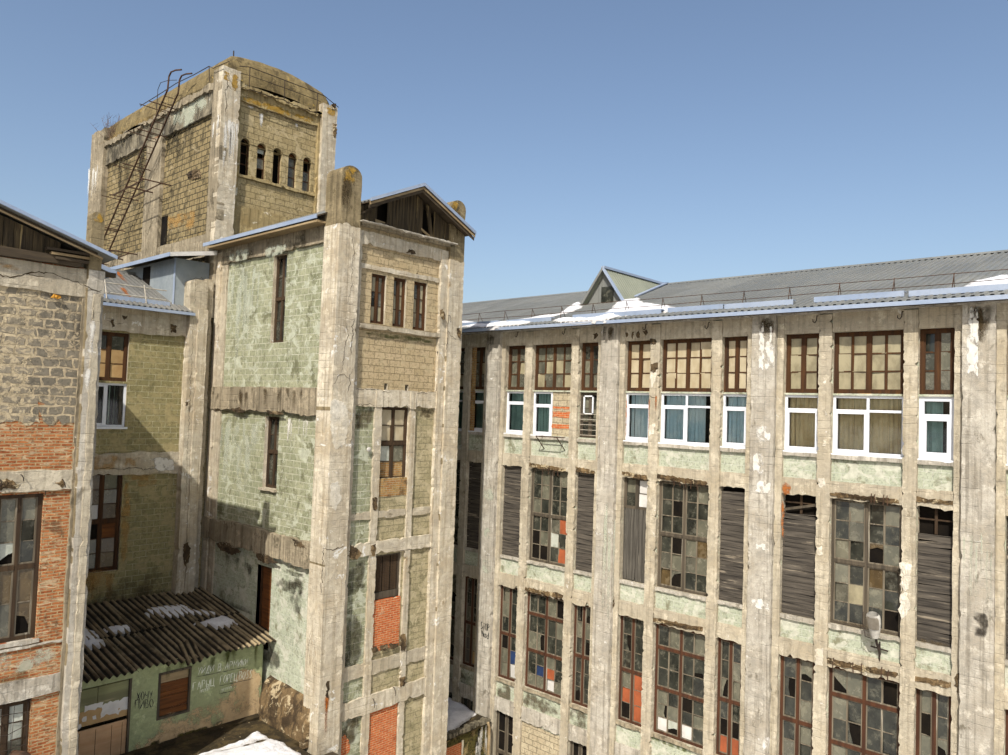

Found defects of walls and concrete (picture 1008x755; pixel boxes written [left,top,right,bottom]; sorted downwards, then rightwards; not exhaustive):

crack [0,271,121,324]
spalling [0,474,24,491]
damp [347,564,364,595]
spalling [898,562,912,619]
damp [345,618,361,666]
spalling [814,648,898,680]